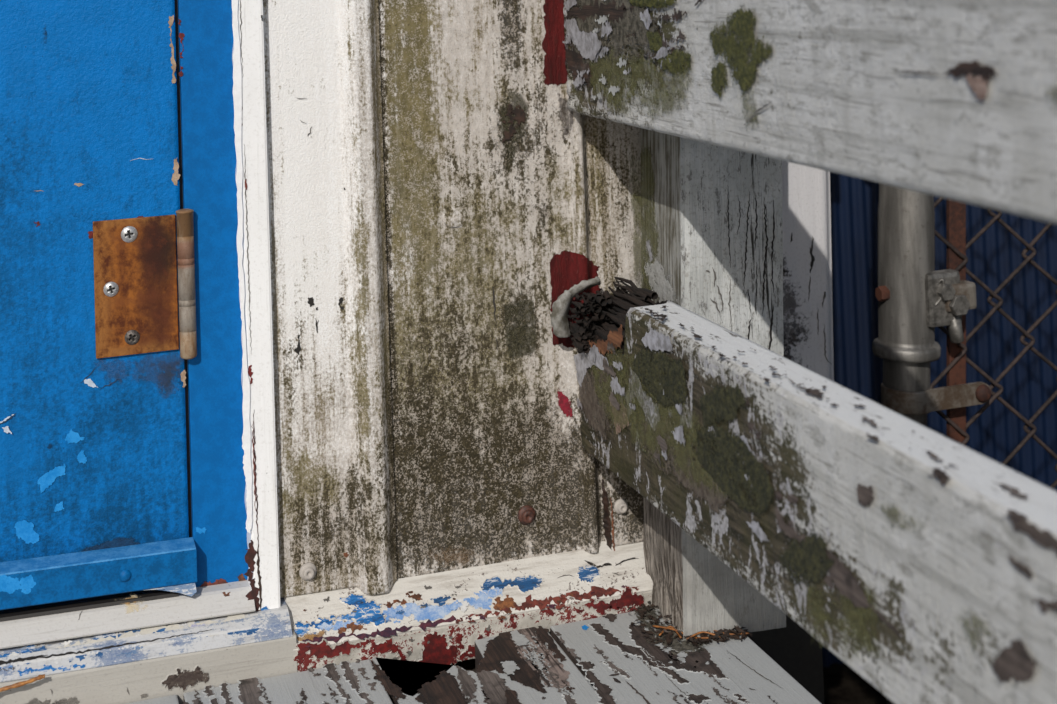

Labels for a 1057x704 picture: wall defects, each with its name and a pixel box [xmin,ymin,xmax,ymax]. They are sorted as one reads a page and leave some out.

crack [706,185,830,363]
peeling [0,0,269,676]
water stain [504,300,537,360]
water stain [783,257,808,364]
peeling [712,346,885,441]
peeling [856,483,874,507]
peeling [1003,509,1057,552]
peeling [293,574,544,639]
peeling [160,664,272,704]
peeling [308,659,377,704]
peeling [555,606,730,704]
peeling [992,639,1037,683]